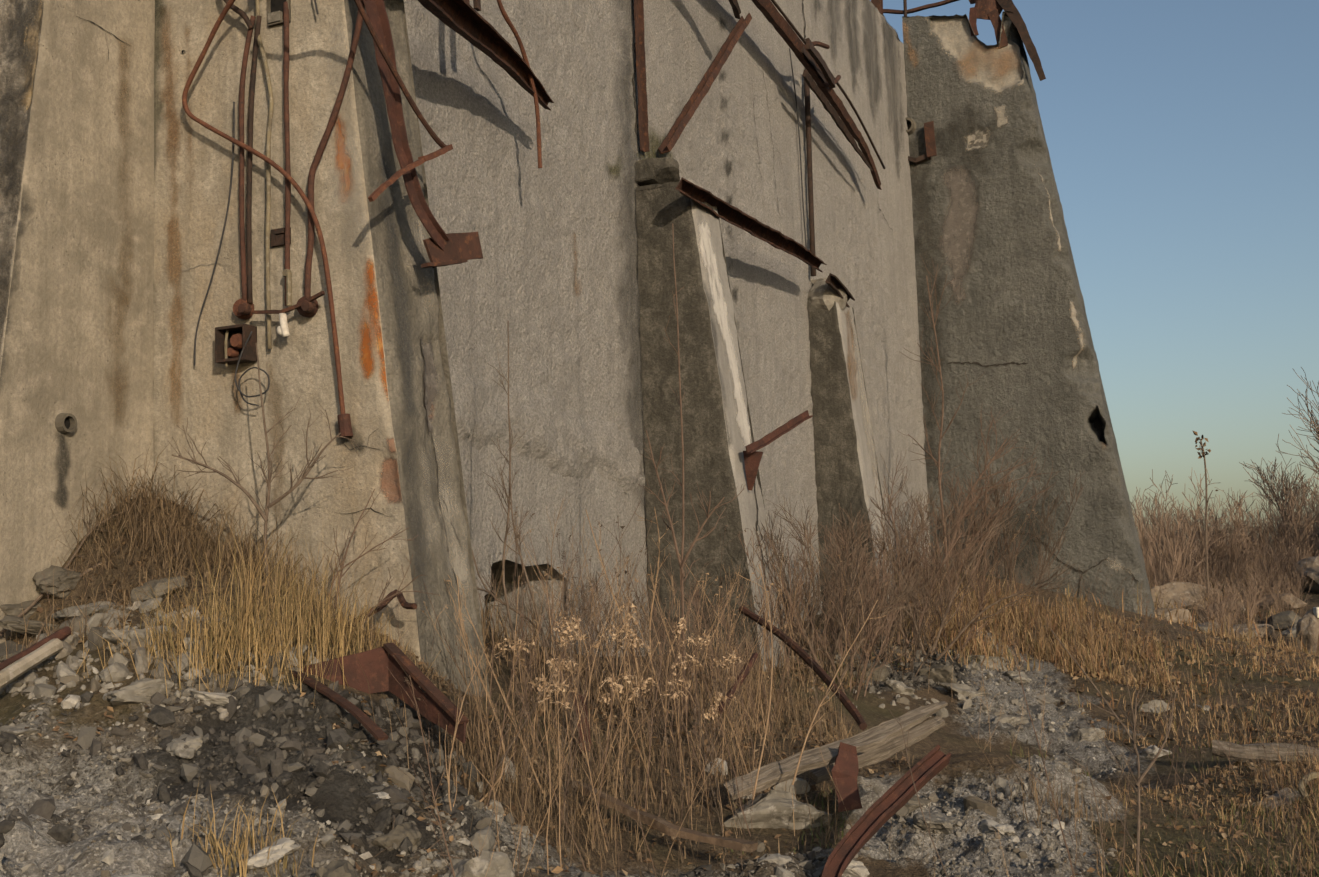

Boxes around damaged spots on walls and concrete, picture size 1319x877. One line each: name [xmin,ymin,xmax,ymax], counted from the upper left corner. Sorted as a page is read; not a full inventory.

spalling [929,15,1024,150]
corrosion [336,117,352,196]
spalling [940,167,979,304]
corrosion [361,262,388,396]
water stain [56,433,69,507]
spalling [1088,415,1106,444]